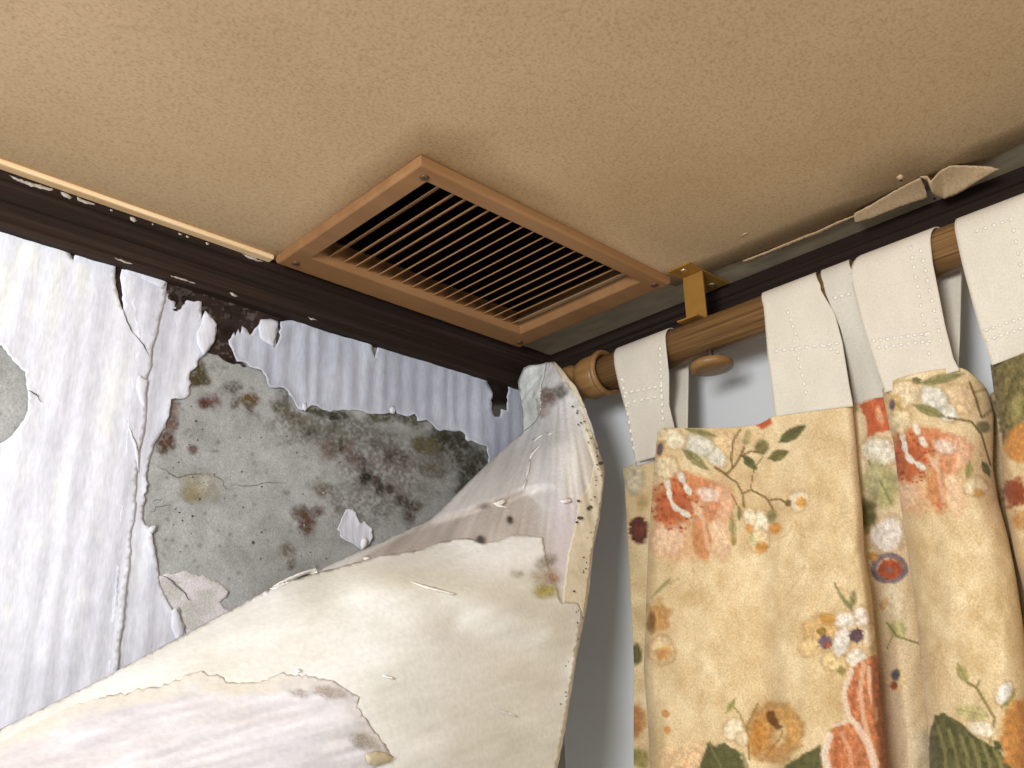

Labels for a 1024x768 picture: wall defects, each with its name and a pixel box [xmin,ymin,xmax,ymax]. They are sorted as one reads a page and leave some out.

spalling [0,346,28,443]
mould [178,364,241,407]
mould [539,386,567,416]
spalling [127,311,489,610]
water stain [273,395,488,521]
mould [571,405,603,523]
water stain [519,558,557,597]